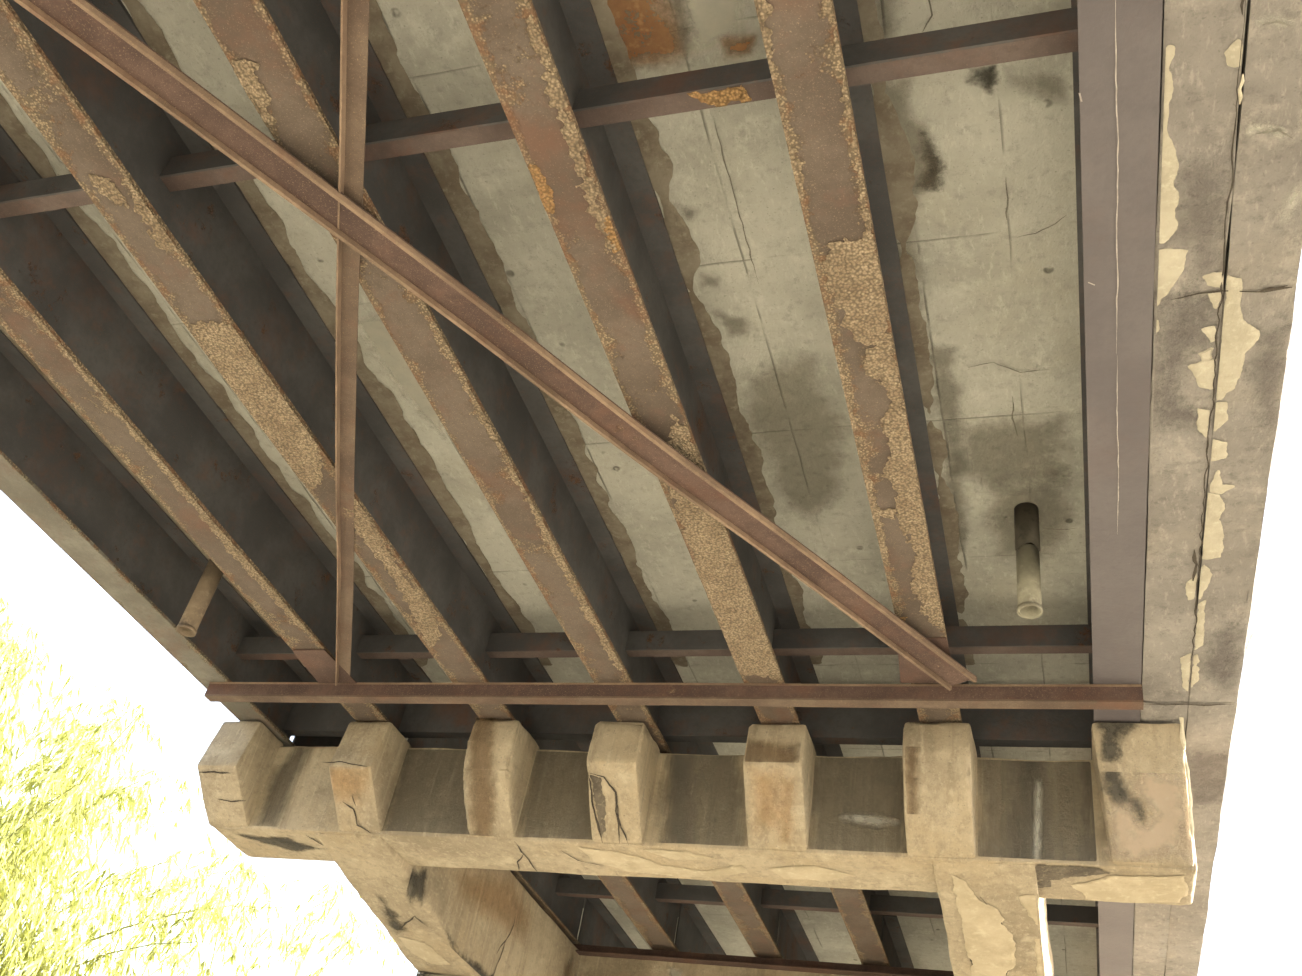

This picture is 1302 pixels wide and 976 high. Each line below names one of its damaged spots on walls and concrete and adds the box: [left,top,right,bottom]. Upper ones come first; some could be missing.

crack [923,0,933,31]
corrosion [88,174,179,254]
water stain [917,133,942,190]
peeling [1156,45,1188,332]
corrosion [821,73,944,628]
crack [1151,0,1292,706]
corrosion [30,314,327,633]
peeling [1180,272,1260,691]
water stain [407,869,427,904]
crack [491,920,515,976]
water stain [979,723,1144,861]
peeling [1019,773,1189,976]